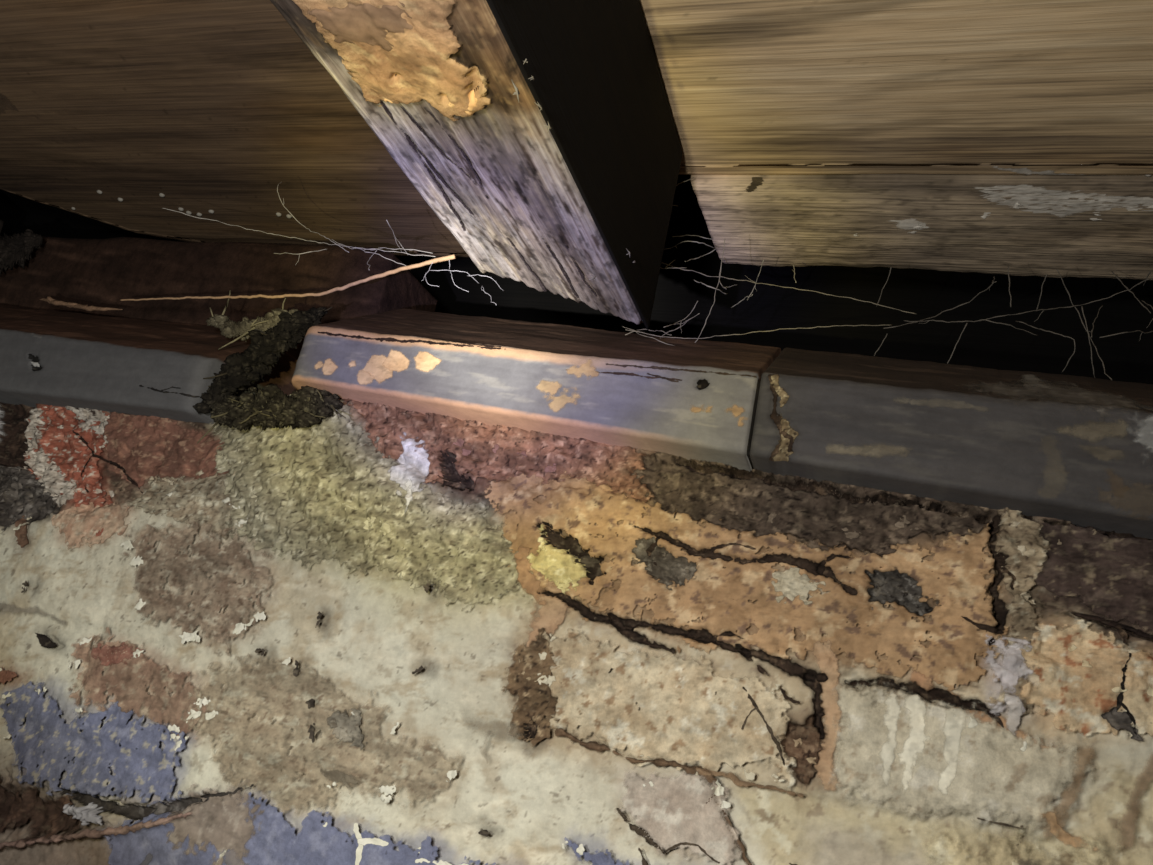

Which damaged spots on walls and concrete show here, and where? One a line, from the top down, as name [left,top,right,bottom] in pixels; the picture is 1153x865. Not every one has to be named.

corrosion [315,350,441,384]
corrosion [537,360,598,412]
water stain [896,375,1153,448]
crack [73,431,143,493]
water stain [388,433,430,513]
water stain [827,444,905,456]
crack [634,526,858,595]
crack [961,516,1016,645]
spalling [0,398,1153,865]
crack [1071,611,1153,741]
crack [537,591,1004,865]